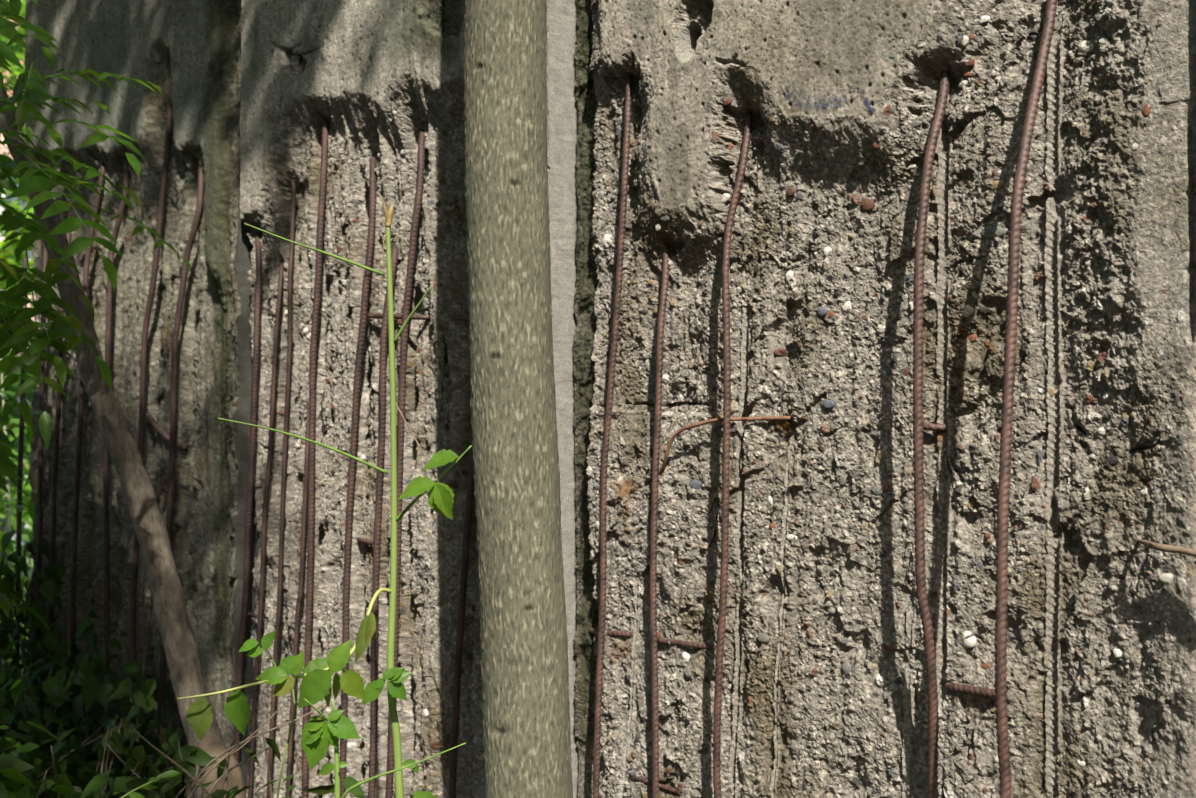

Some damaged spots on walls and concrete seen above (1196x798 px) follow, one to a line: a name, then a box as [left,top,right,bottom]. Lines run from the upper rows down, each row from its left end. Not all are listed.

spalling [24,0,485,798]
spalling [573,0,1196,798]